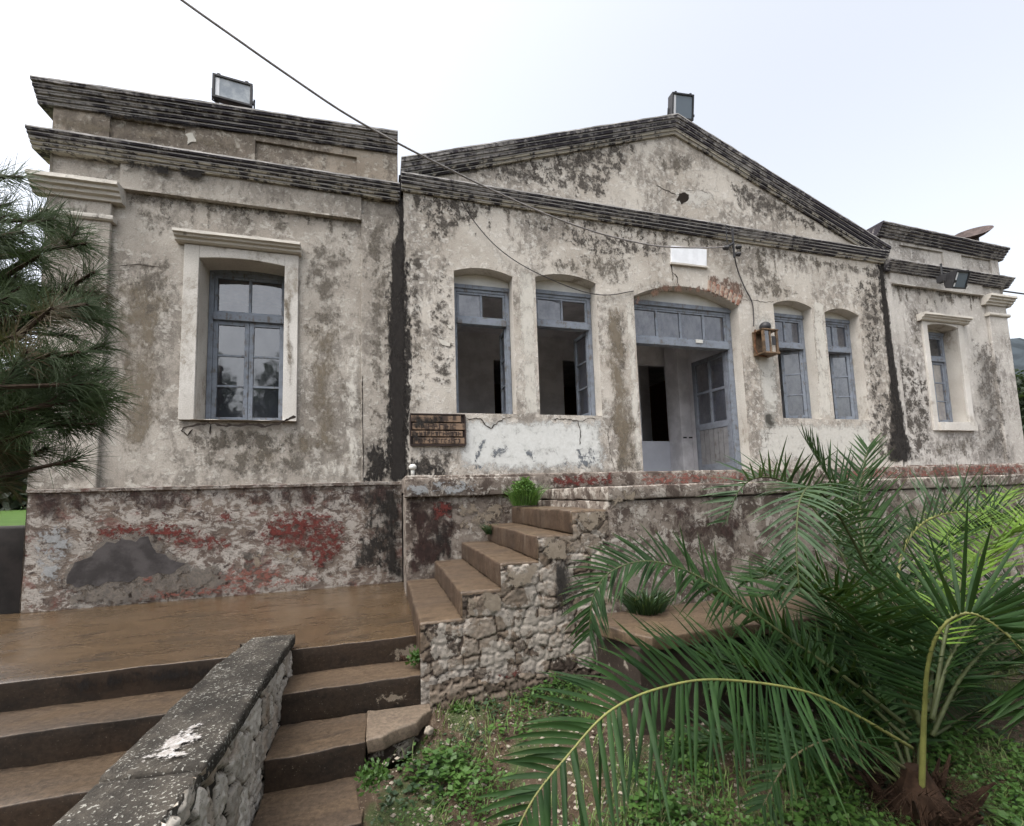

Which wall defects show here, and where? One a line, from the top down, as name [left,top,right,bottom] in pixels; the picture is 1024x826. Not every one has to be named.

leakage [468,143,634,197]
leakage [660,153,691,175]
spalling [675,189,712,208]
flaking render [707,276,744,306]
leakage [211,195,1010,576]
crack [554,415,615,472]
peeling [553,472,612,487]
leakage [35,493,91,517]
leakage [114,490,198,509]
peeling [96,521,231,552]
peeling [143,506,346,599]
spalling [141,723,203,762]